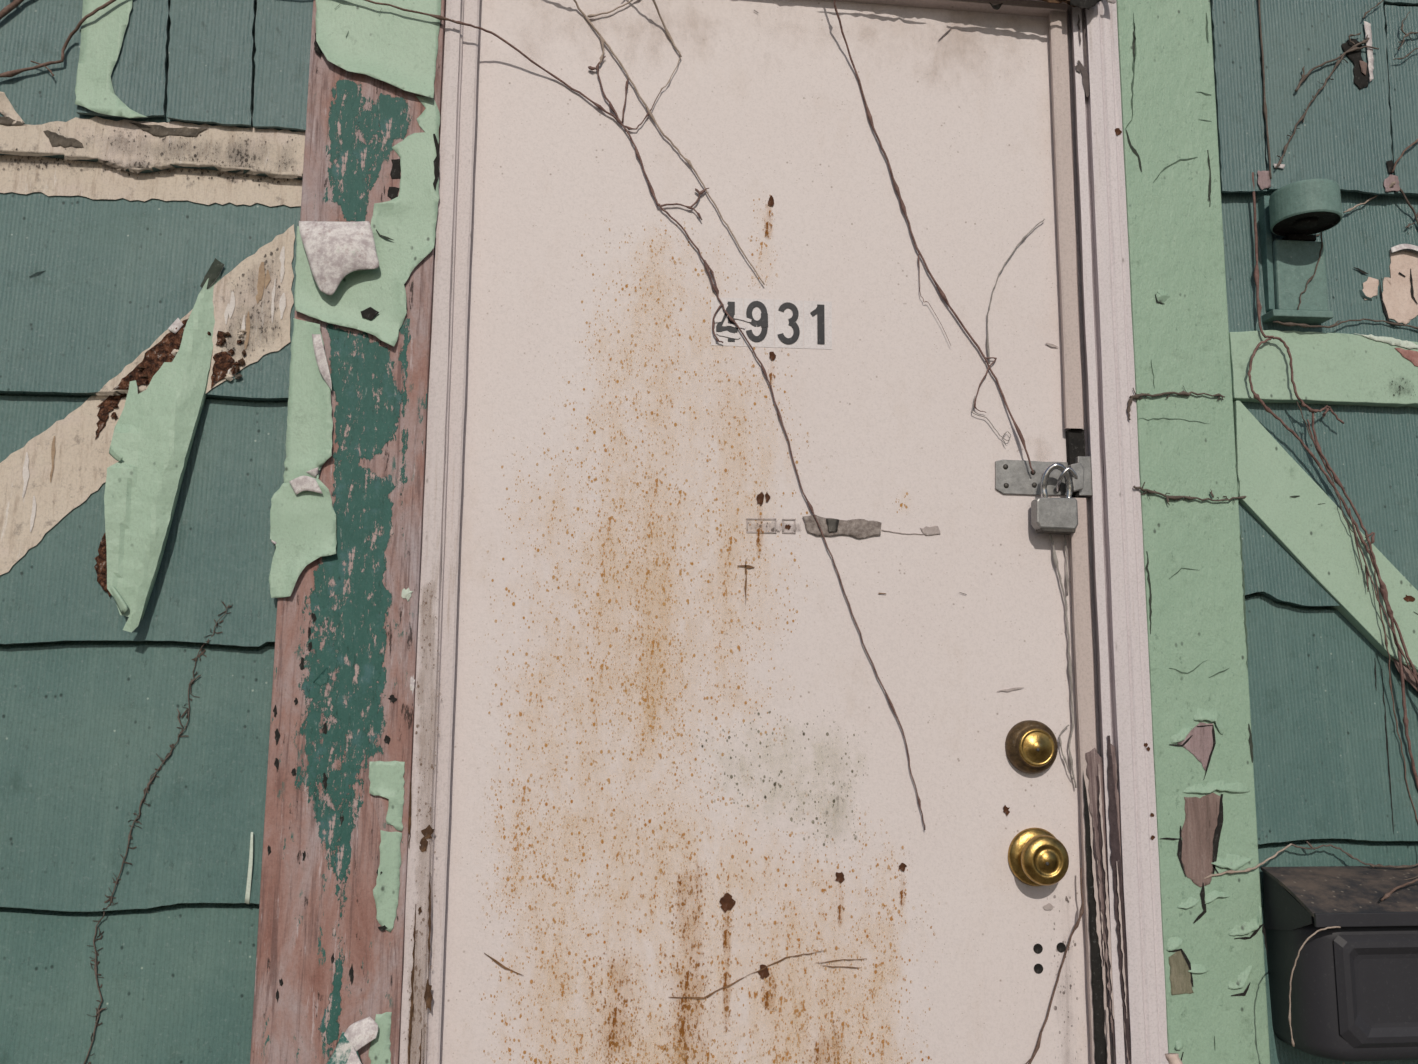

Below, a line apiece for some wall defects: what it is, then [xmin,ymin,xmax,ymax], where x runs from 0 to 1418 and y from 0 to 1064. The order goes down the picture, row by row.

corrosion [751,195,776,285]
peeling [1353,244,1418,367]
peeling [0,0,441,1064]
corrosion [481,220,934,1064]
peeling [1160,707,1252,923]
peeling [1166,937,1208,995]
peeling [1228,965,1253,996]
peeling [1228,906,1267,954]